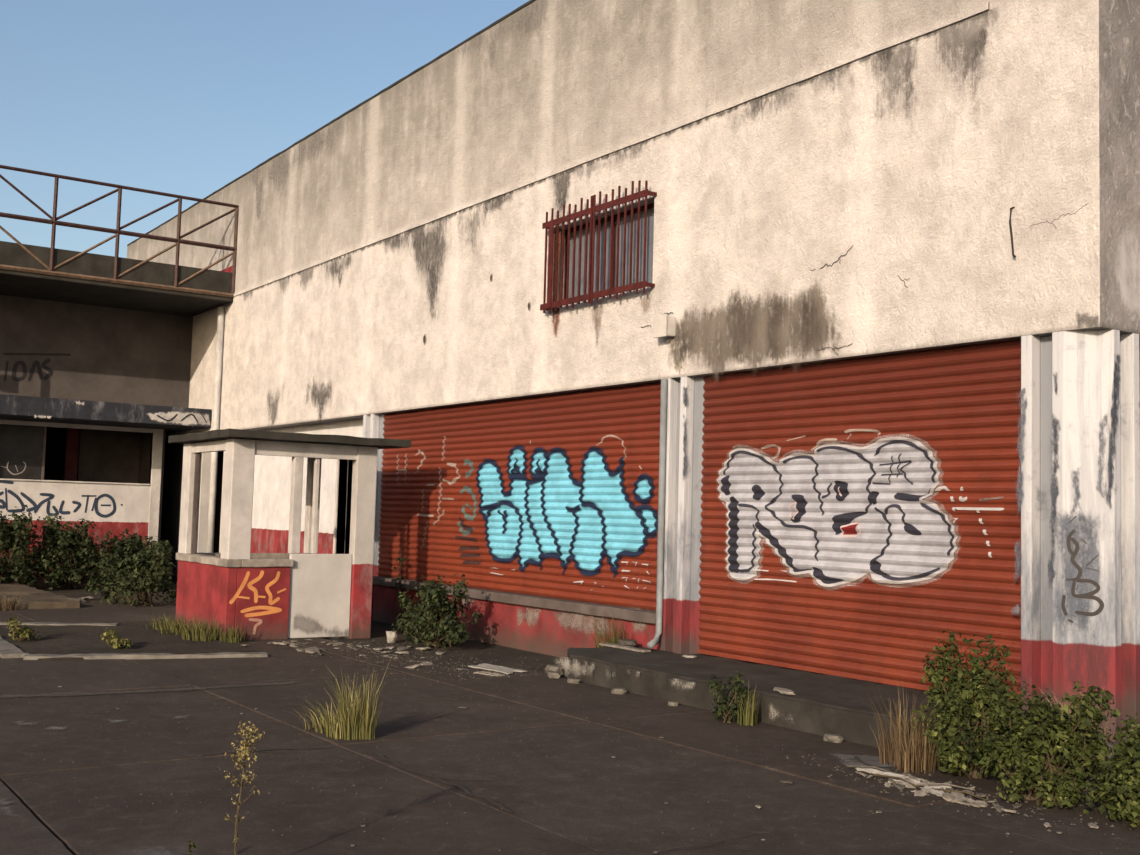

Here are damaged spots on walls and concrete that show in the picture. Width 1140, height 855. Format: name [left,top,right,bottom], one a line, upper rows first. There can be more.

leakage [240,9,995,316]
crack [811,245,853,271]
leakage [671,283,835,374]
leakage [267,393,279,424]
leakage [307,384,331,421]
peeling [1017,388,1027,511]
peeling [1096,355,1121,506]
peeling [1048,418,1100,626]